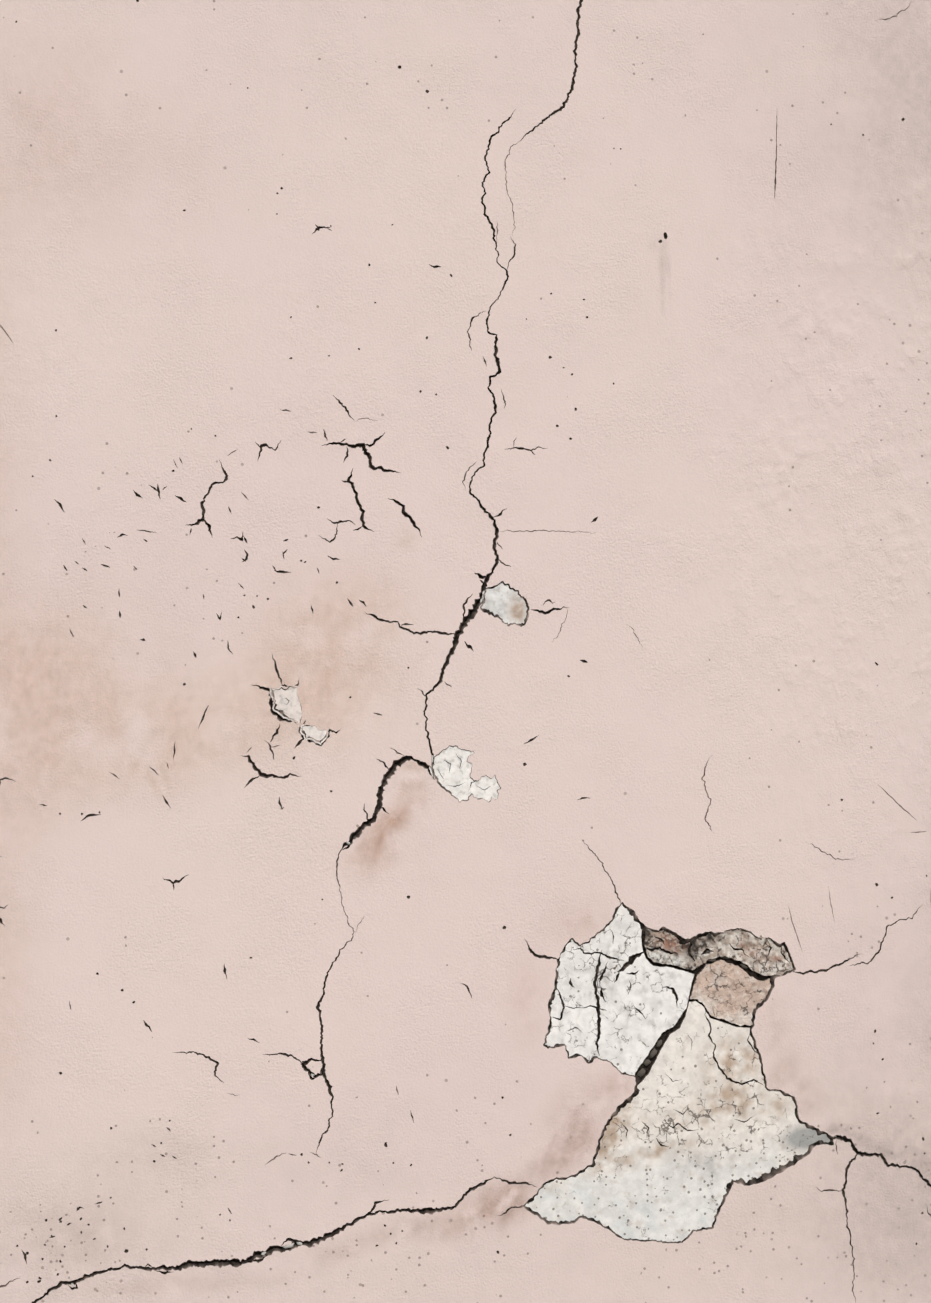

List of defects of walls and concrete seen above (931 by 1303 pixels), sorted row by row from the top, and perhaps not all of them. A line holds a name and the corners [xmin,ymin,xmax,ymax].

crack [133,395,422,589]
crack [63,530,157,641]
crack [241,0,598,1163]
spalling [476,581,529,627]
crack [150,705,209,808]
spalling [269,686,329,745]
spalling [427,745,501,803]
crack [163,875,188,889]
crack [143,1020,238,1096]
spalling [523,902,836,1243]
crack [0,1176,536,1303]
crack [816,1135,931,1302]